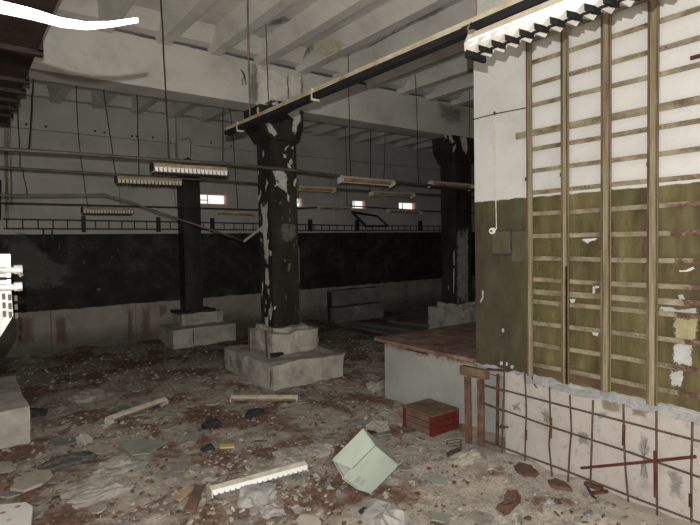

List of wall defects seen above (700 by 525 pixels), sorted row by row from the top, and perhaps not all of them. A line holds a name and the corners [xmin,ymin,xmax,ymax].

peeling [288,109,301,134]
peeling [444,133,468,154]
peeling [258,145,301,358]
peeling [448,227,469,305]
peeling [659,306,700,388]
corrosion [486,368,510,445]